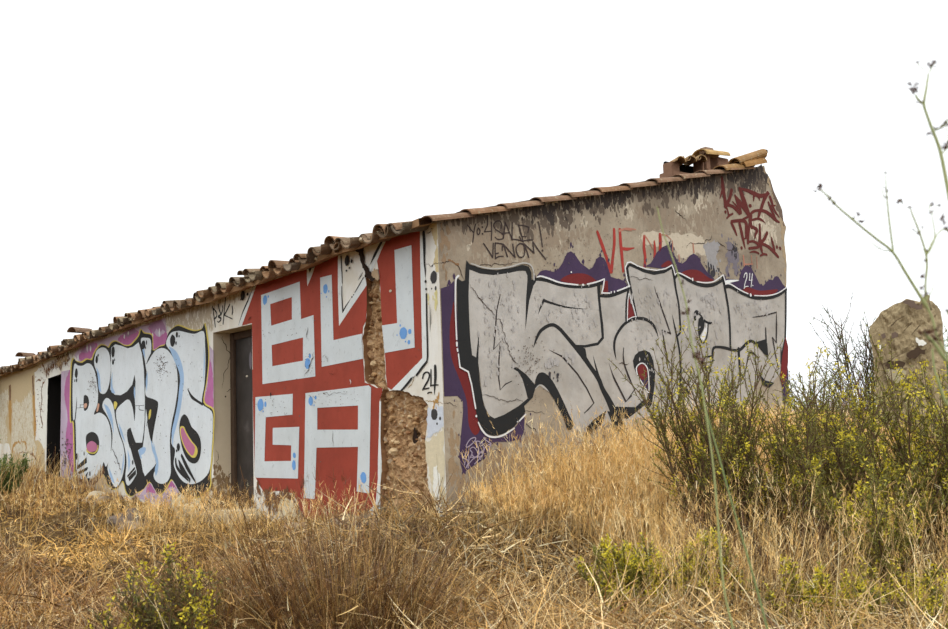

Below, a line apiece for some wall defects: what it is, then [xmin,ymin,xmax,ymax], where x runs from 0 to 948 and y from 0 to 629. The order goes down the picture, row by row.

crack [355,248,375,281]
damp [440,164,769,397]
peeling [412,405,446,501]